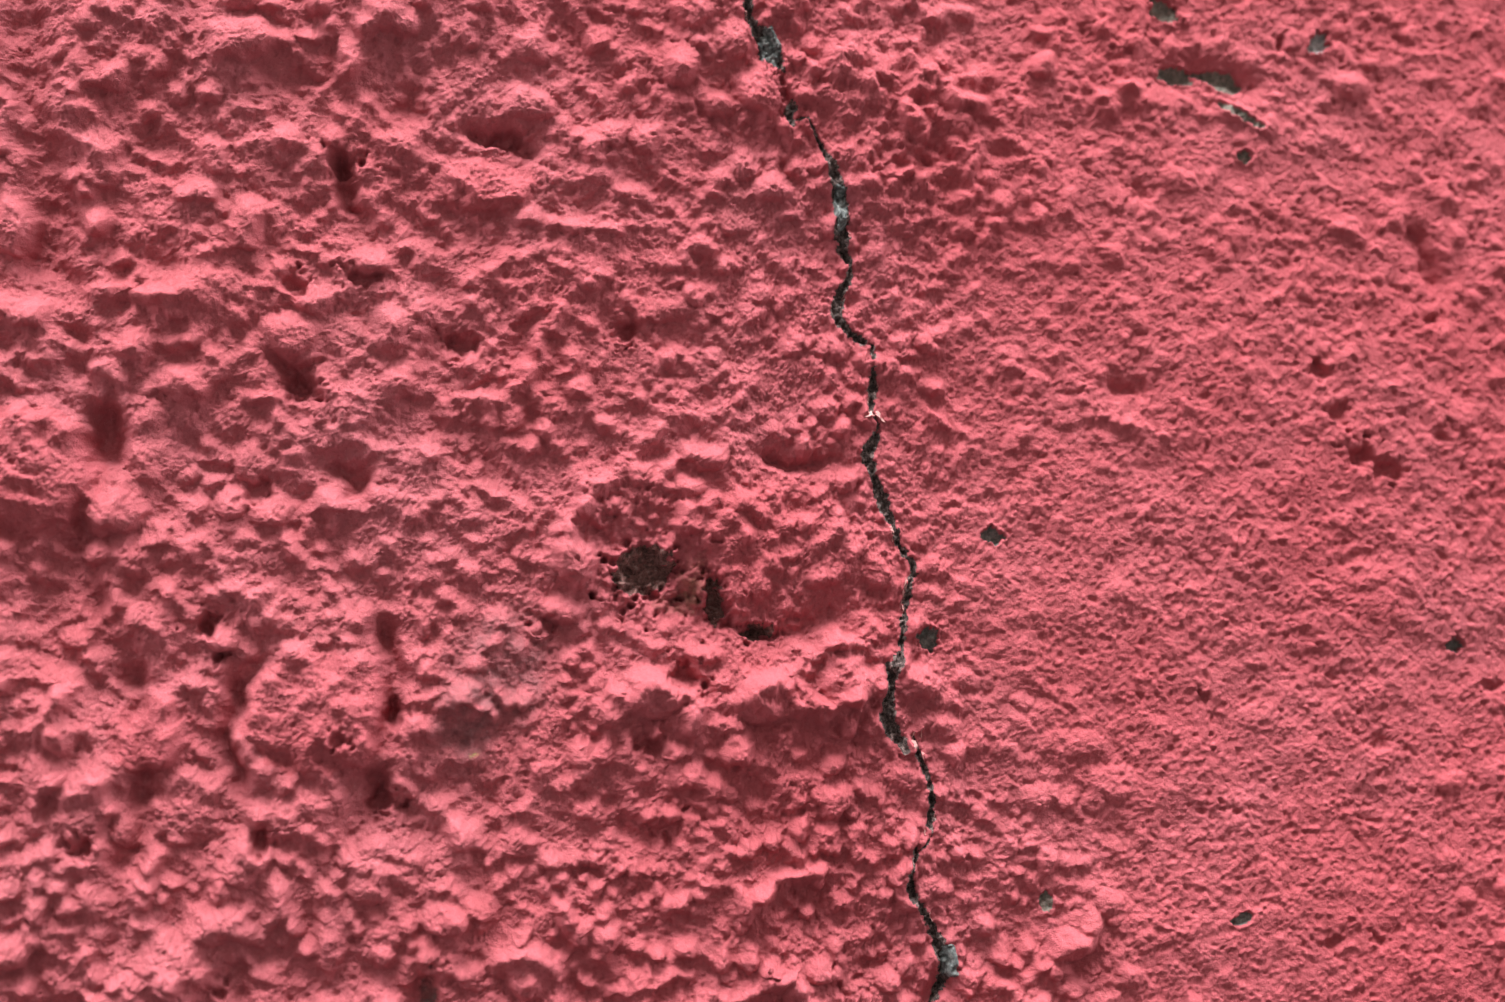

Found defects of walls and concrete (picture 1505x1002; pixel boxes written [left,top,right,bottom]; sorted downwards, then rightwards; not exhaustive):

crack [742,0,959,1002]